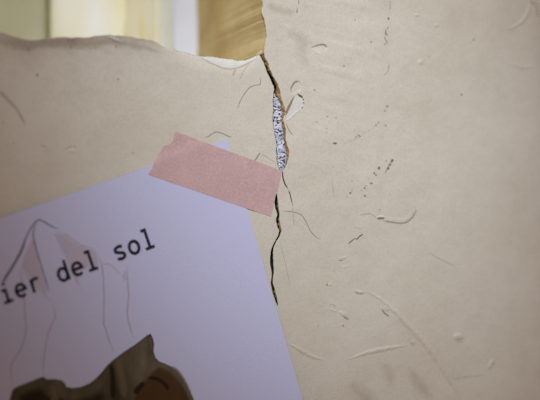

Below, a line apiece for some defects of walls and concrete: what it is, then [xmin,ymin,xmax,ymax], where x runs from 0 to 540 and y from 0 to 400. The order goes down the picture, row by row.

crack [238,54,319,306]
spalling [286,81,304,135]